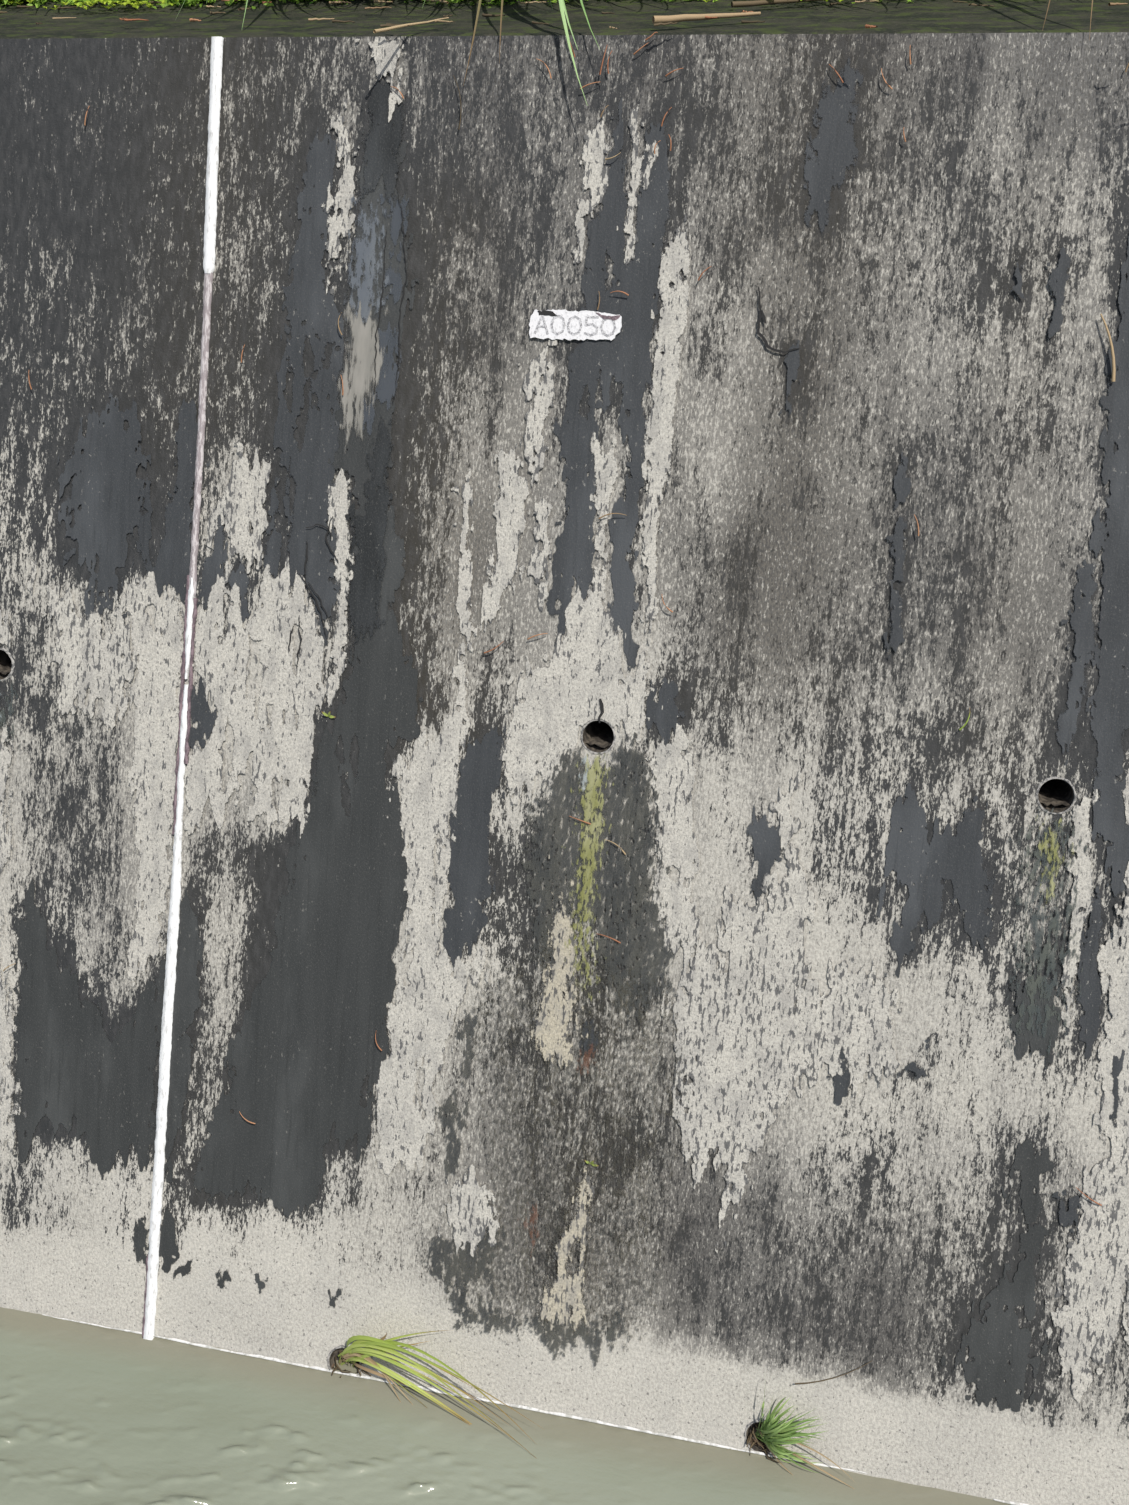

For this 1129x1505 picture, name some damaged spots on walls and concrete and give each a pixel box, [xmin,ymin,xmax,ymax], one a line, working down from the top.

damp [421,732,690,1369]
damp [1000,806,1103,1059]